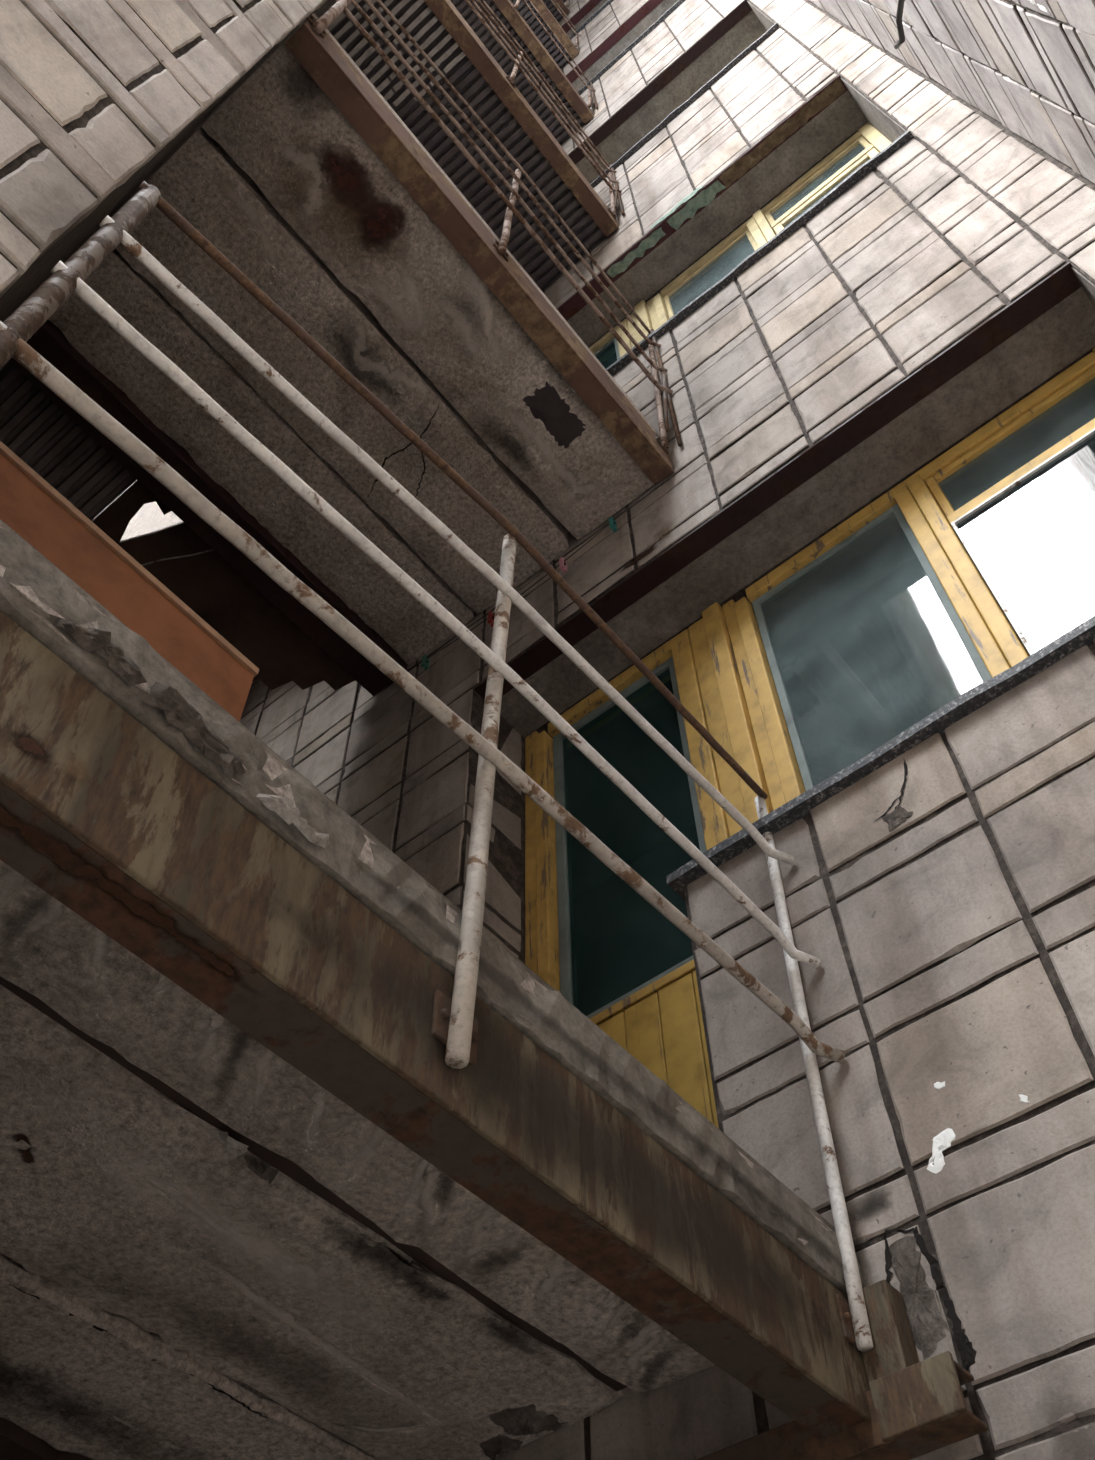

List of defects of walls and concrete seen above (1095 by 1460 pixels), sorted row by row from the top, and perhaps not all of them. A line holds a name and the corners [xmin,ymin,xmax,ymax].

rust [14,733,50,763]
rust [0,803,253,992]
rust [12,1133,34,1164]
spalling [884,1226,977,1370]
spalling [479,1404,569,1460]